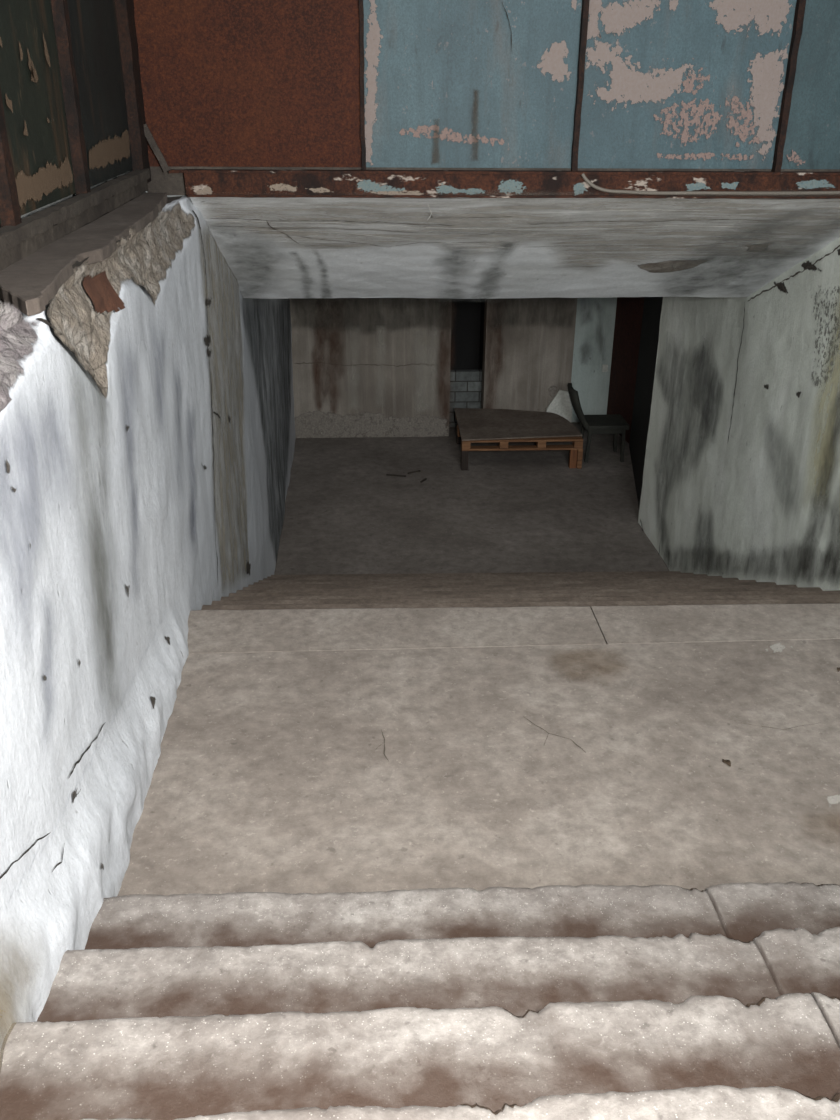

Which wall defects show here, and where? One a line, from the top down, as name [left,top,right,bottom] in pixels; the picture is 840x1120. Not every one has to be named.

peeling [19,33,51,84]
peeling [15,156,73,209]
peeling [89,130,130,169]
peeling [196,0,840,273]
spalling [0,203,195,412]
water stain [817,359,840,492]
crack [69,722,106,802]
crack [0,834,64,879]